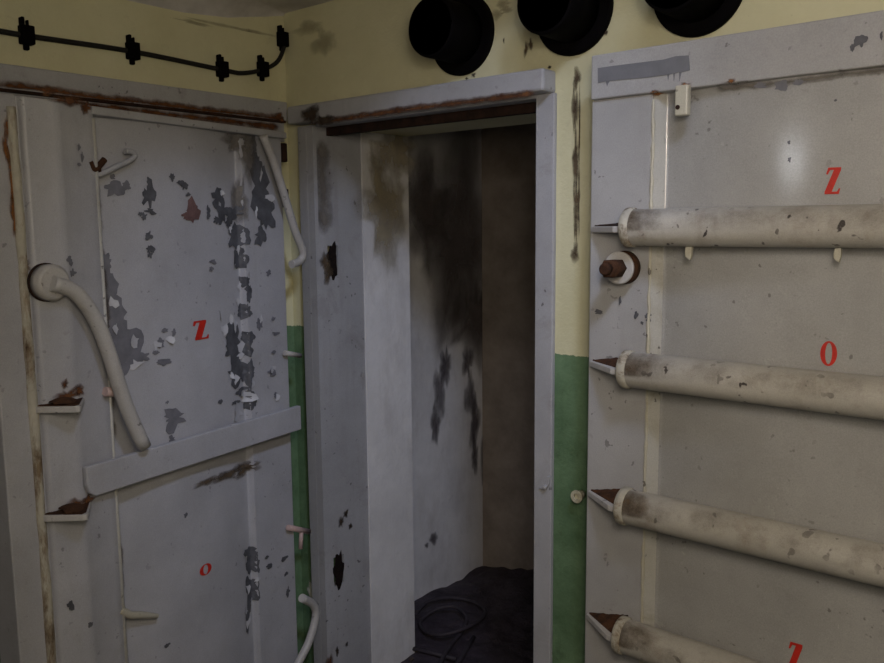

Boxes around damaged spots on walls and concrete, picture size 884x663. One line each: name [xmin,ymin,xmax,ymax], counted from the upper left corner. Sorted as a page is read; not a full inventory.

rust [0,82,284,152]
peeling [104,174,131,197]
peeling [103,253,176,376]
peeling [138,177,157,221]
peeling [145,231,156,258]
peeling [169,136,276,422]
rust [571,90,580,259]
water stain [432,350,450,441]
water stain [464,351,483,468]
rust [197,462,258,487]